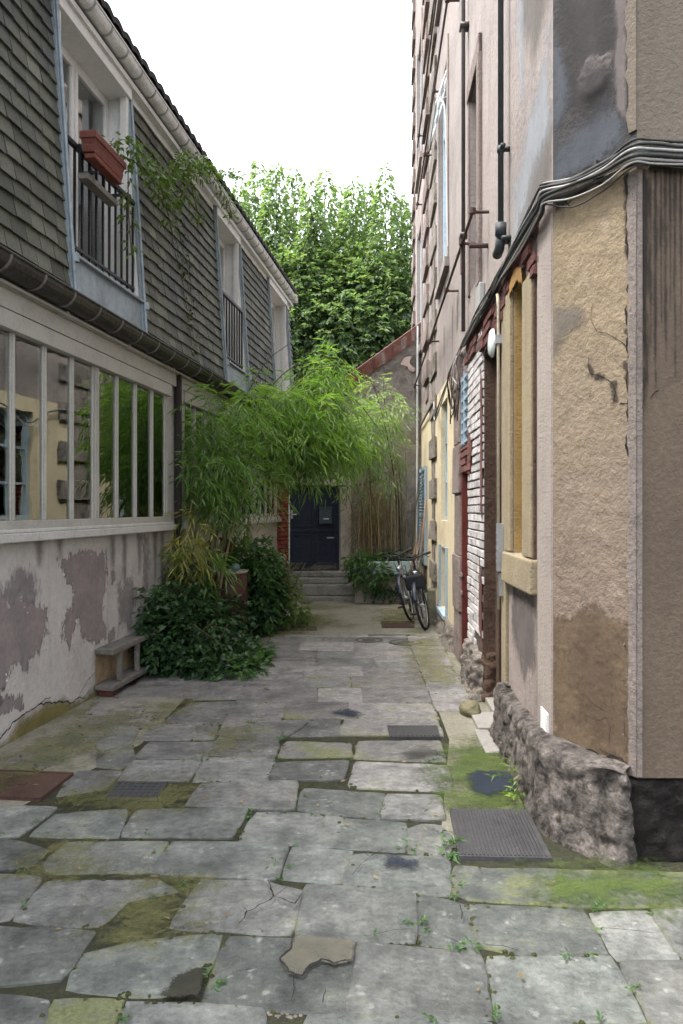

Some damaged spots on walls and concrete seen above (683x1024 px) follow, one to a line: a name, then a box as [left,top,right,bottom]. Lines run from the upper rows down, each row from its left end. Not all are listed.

damp [514,0,627,233]
crack [588,173,659,456]
peeling [0,582,49,716]
crack [0,674,94,739]
peeling [56,548,116,652]
crack [238,880,302,925]